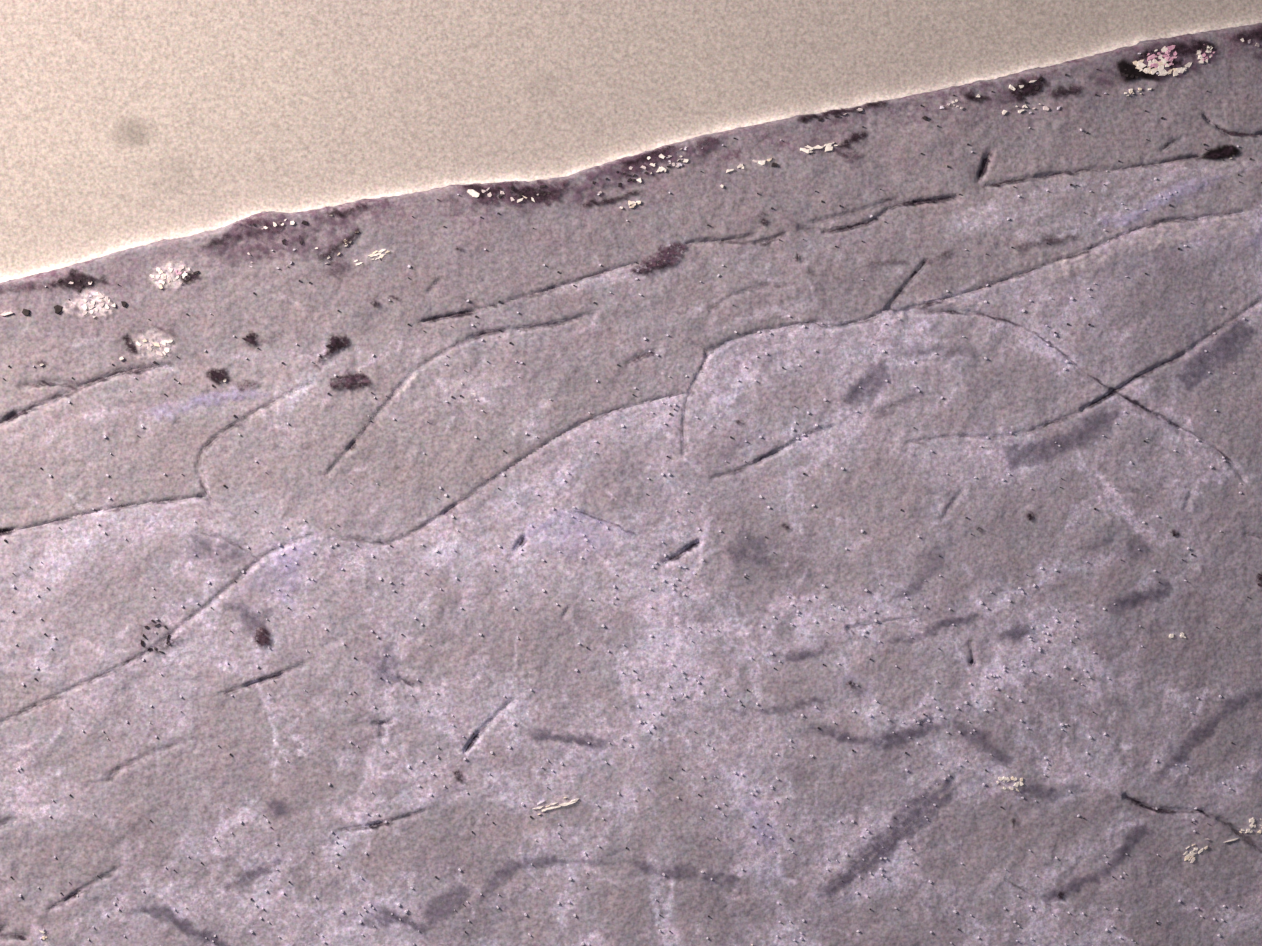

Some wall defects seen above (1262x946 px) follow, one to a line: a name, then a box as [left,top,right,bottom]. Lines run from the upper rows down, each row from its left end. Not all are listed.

crack [1204,115,1258,136]
crack [978,153,1080,187]
crack [830,198,945,232]
crack [910,267,1143,407]
crack [1127,796,1235,831]